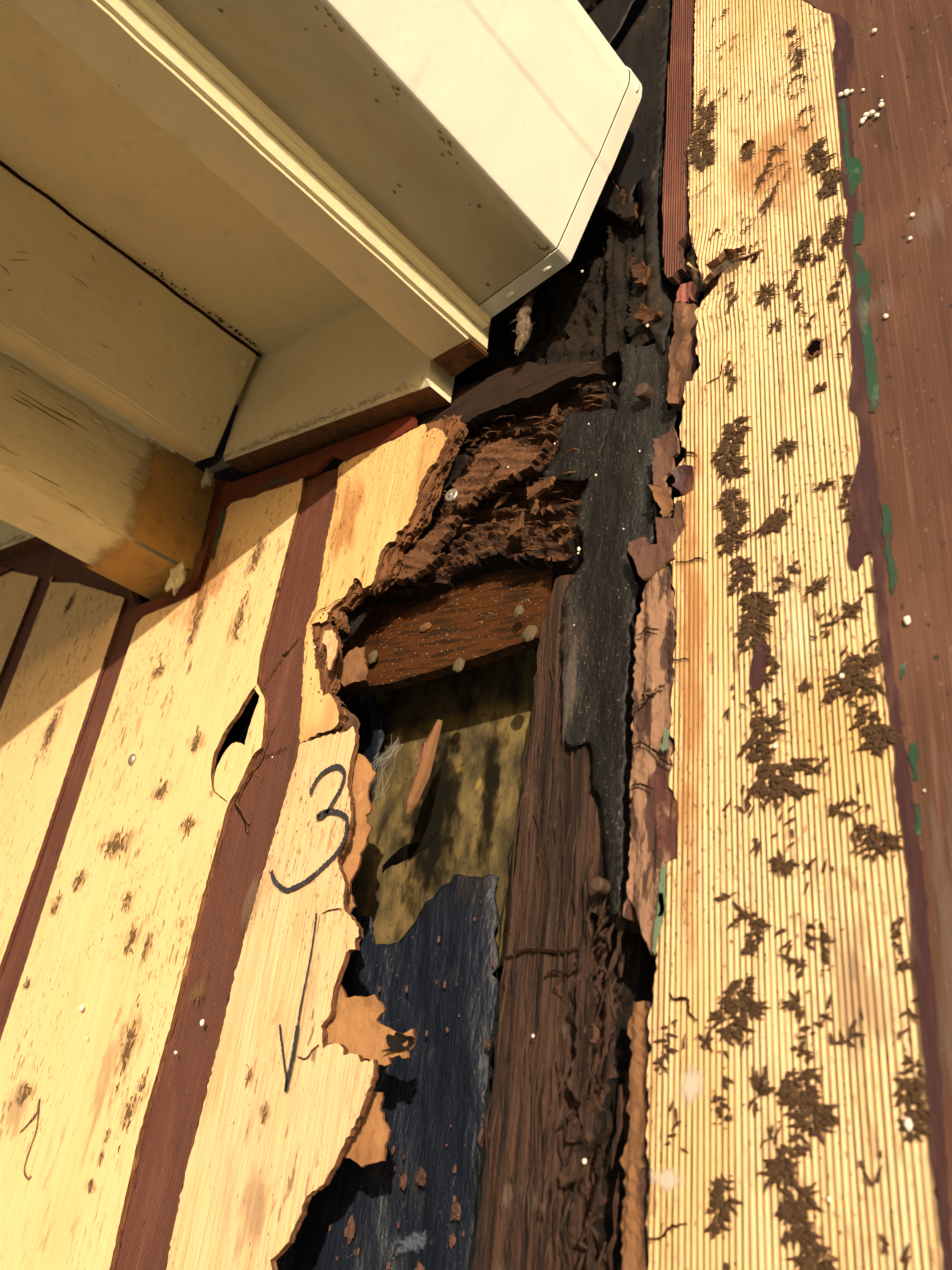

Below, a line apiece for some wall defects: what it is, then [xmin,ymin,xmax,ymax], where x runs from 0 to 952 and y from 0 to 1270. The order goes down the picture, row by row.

spalling [610,0,648,52]
spalling [633,0,673,237]
spalling [661,242,729,307]
spalling [195,404,365,482]
spalling [303,383,603,702]
peeling [627,376,695,625]
spalling [215,691,259,772]
damp [402,731,463,912]
damp [477,718,502,865]
spalling [638,937,657,995]